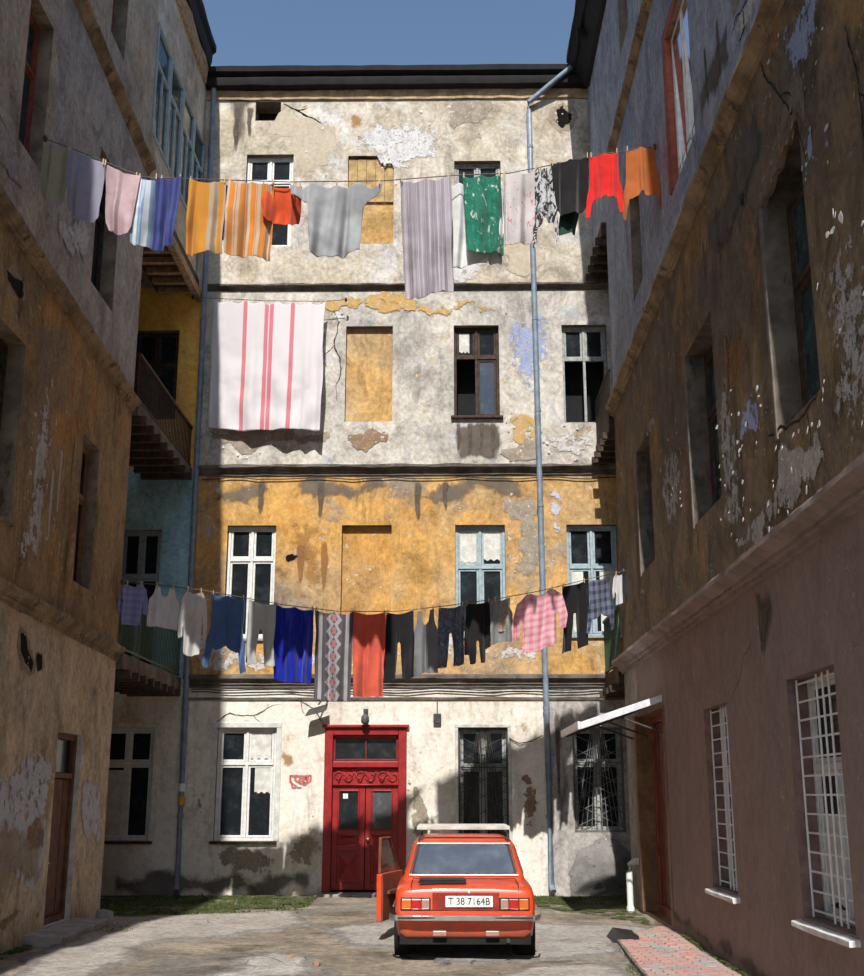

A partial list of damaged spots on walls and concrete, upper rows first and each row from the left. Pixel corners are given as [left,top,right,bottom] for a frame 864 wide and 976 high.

flaking render [357,121,440,169]
crack [760,63,806,159]
flaking render [769,0,824,181]
crack [844,25,864,140]
flaking render [453,263,489,282]
flaking render [322,290,549,394]
flaking render [817,211,864,445]
leakage [218,483,267,513]
leakage [299,476,383,516]
leakage [415,476,521,519]
flaking render [715,377,824,547]
leakage [116,870,309,896]